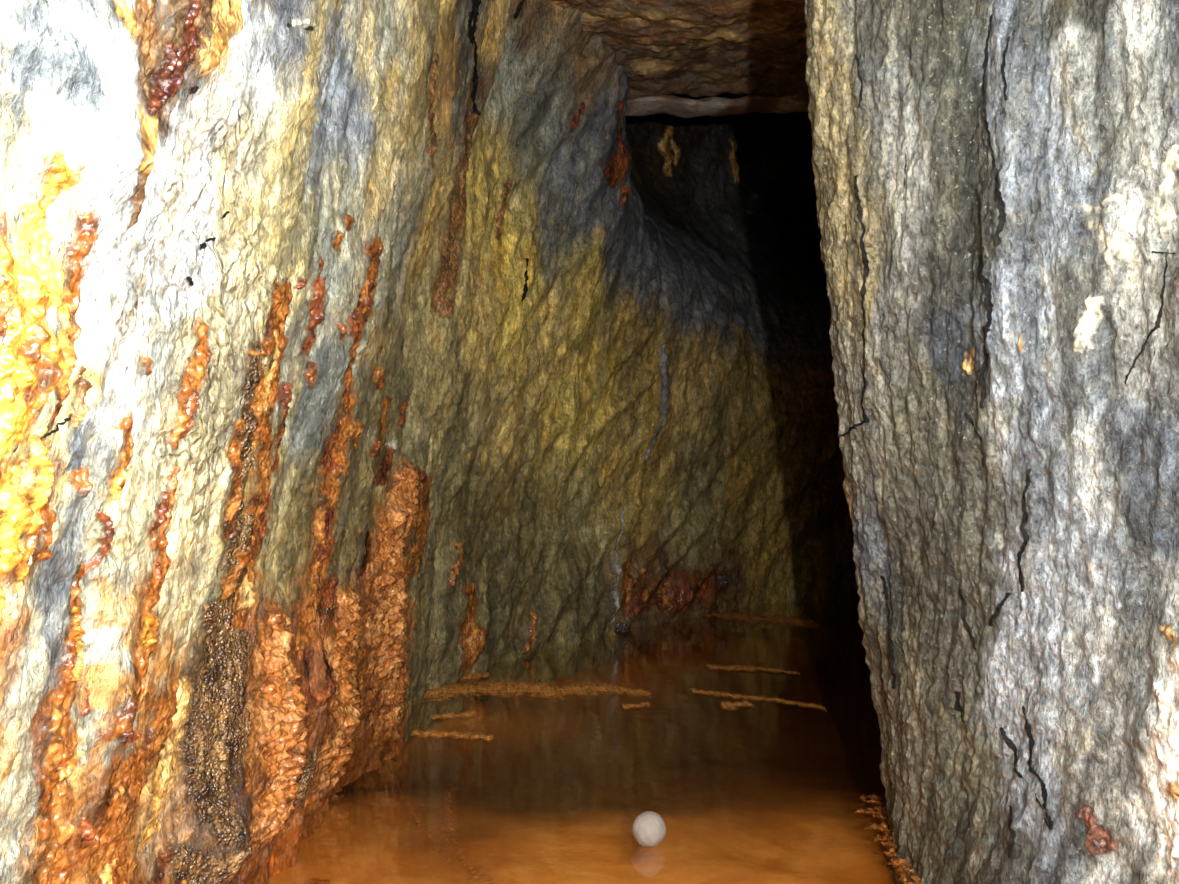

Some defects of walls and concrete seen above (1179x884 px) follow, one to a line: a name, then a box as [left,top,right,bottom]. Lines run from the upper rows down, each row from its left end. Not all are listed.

corrosion [0,149,100,625]
corrosion [33,466,192,884]
corrosion [110,412,134,500]
corrosion [114,0,244,228]
corrosion [170,319,212,449]
corrosion [221,257,327,629]
corrosion [292,237,409,707]
crack [837,175,870,438]
crack [855,54,863,108]
crack [880,575,896,689]
crack [964,14,1010,467]
crack [959,469,1031,650]